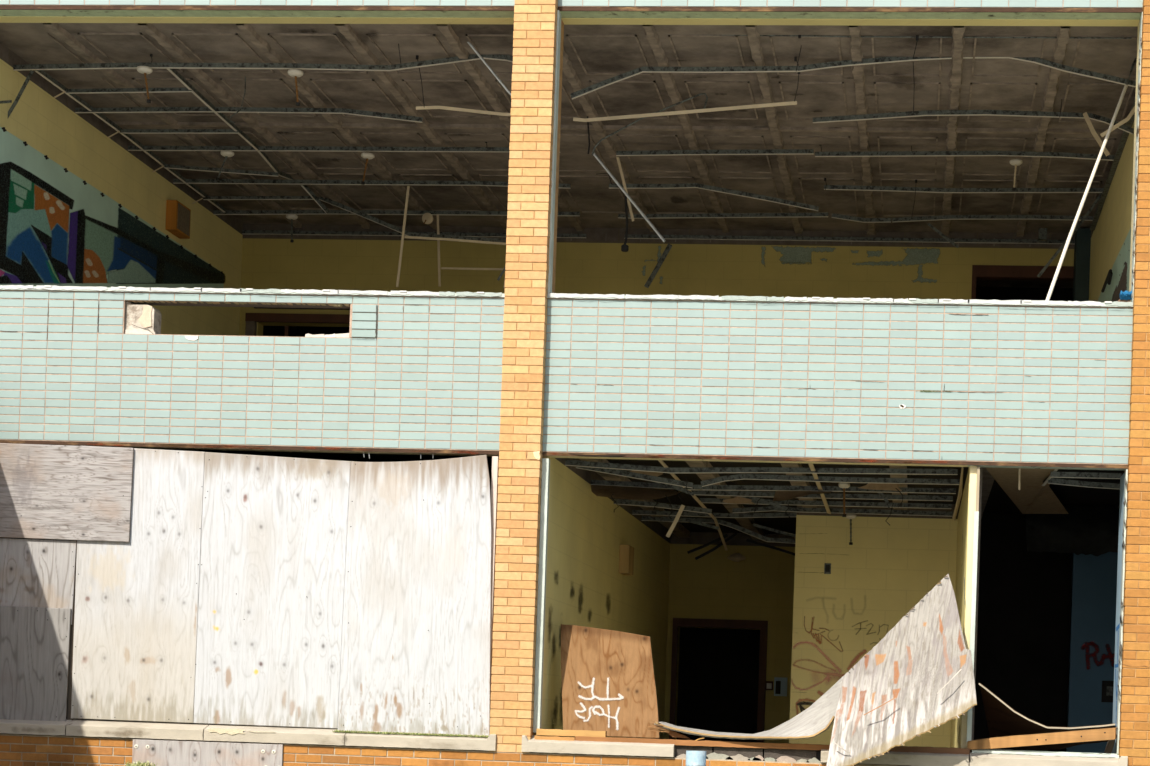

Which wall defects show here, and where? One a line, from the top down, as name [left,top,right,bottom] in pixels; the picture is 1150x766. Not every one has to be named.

peeling [0,285,502,328]
peeling [548,223,1135,307]